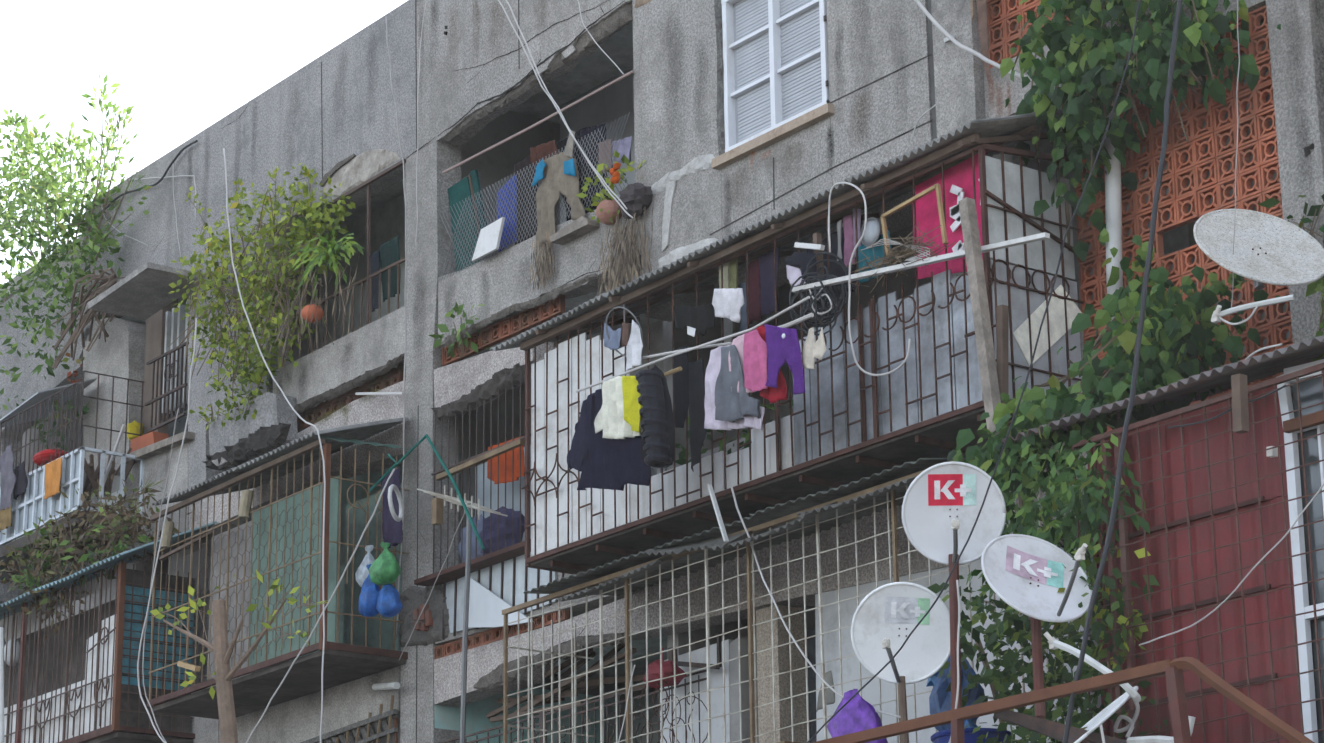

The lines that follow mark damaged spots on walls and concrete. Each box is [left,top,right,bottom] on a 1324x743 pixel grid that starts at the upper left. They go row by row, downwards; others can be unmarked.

spalling [320,149,399,197]
peeling [651,0,725,268]